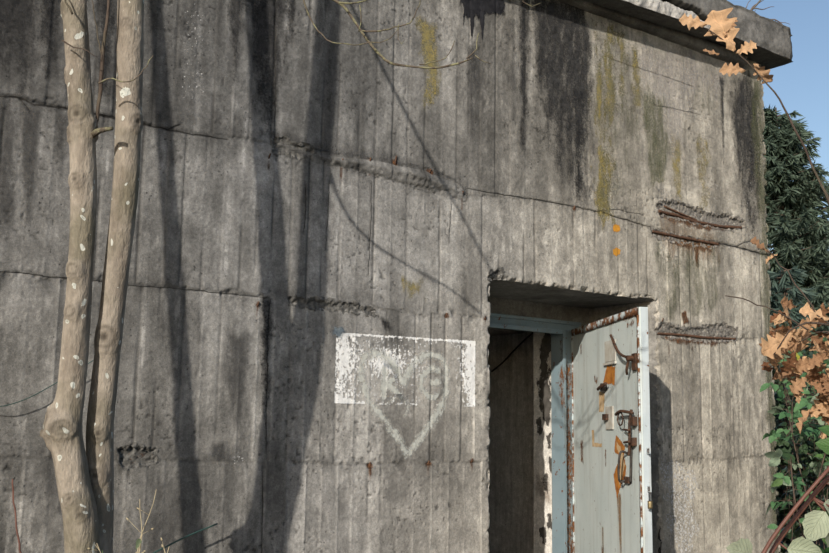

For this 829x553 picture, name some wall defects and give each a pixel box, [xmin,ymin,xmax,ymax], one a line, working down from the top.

leakage [460,0,505,39]
leakage [228,0,295,135]
crack [0,96,68,110]
leakage [510,0,592,197]
crack [143,123,224,139]
spalling [650,173,752,250]
rust [675,239,713,266]
spalling [654,321,738,344]
rust [594,365,615,385]
peeling [536,333,552,491]
rust [559,364,583,553]
peeling [539,513,552,545]